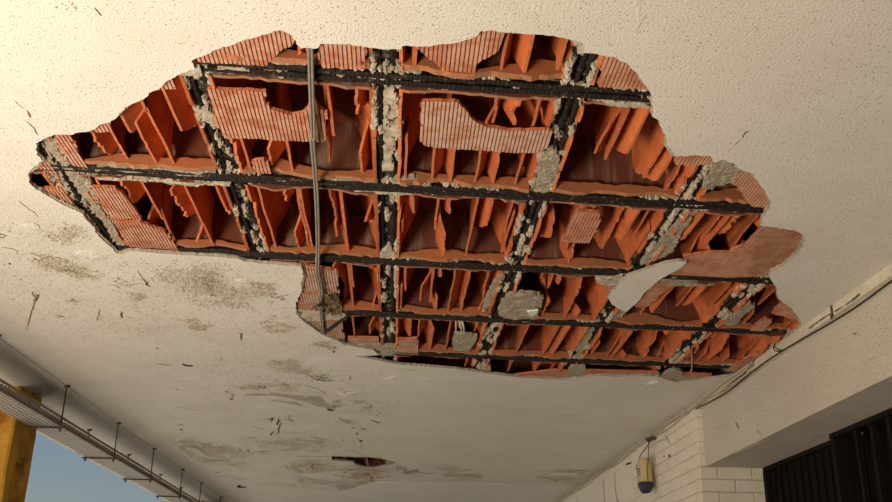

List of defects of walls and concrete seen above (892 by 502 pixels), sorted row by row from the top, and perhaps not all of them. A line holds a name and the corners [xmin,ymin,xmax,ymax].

spalling [44,191,85,213]
spalling [197,253,306,291]
spalling [296,307,379,359]